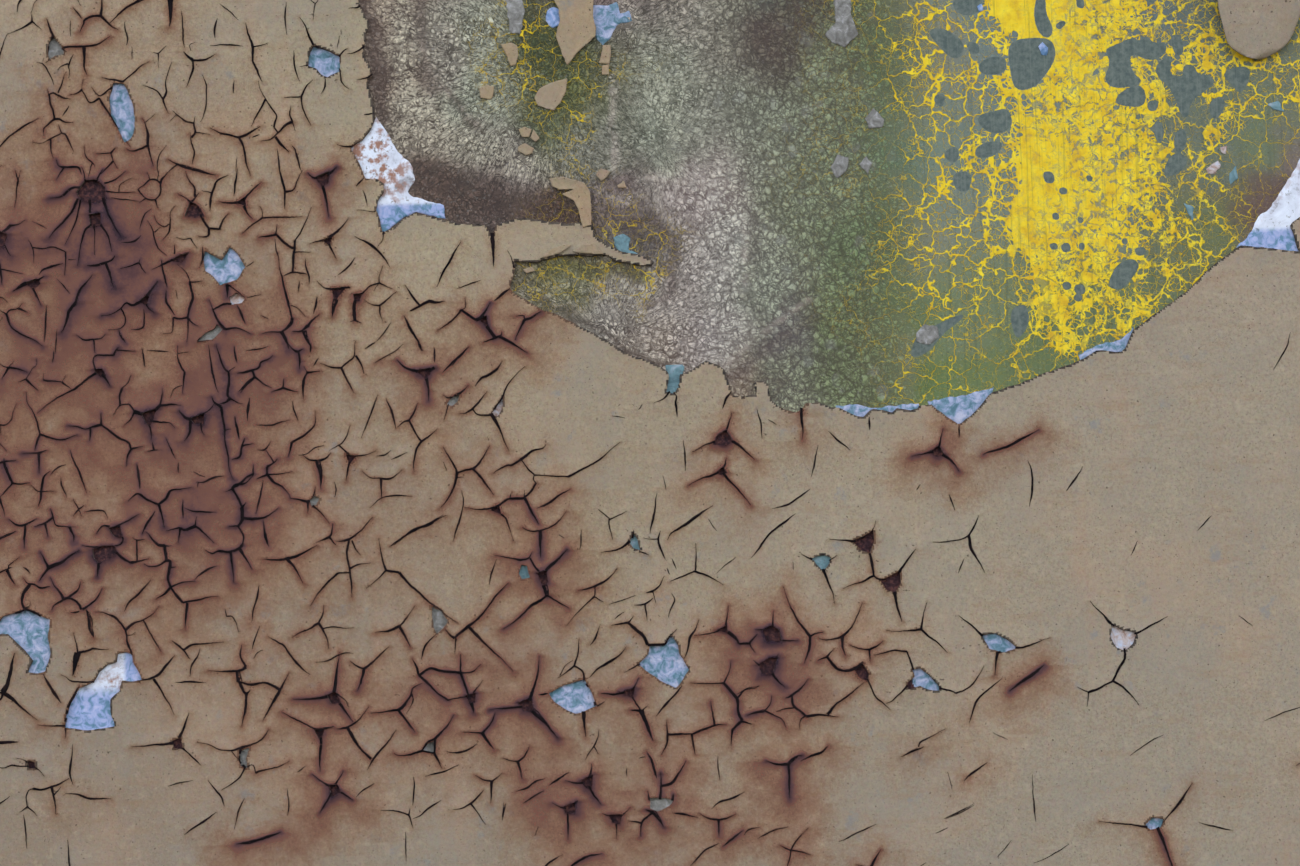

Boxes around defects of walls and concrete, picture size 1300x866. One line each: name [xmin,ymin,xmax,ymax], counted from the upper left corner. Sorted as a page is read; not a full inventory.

peeling [352,0,1300,424]
peeling [204,248,245,305]
rust [0,0,904,866]
crack [0,0,986,866]
crack [984,430,1038,506]
peeling [0,610,50,673]
peeling [65,652,142,730]
peeling [550,680,595,714]
peeling [640,636,689,688]
crack [939,617,1049,723]
crack [1078,601,1168,706]
crack [1099,784,1230,866]